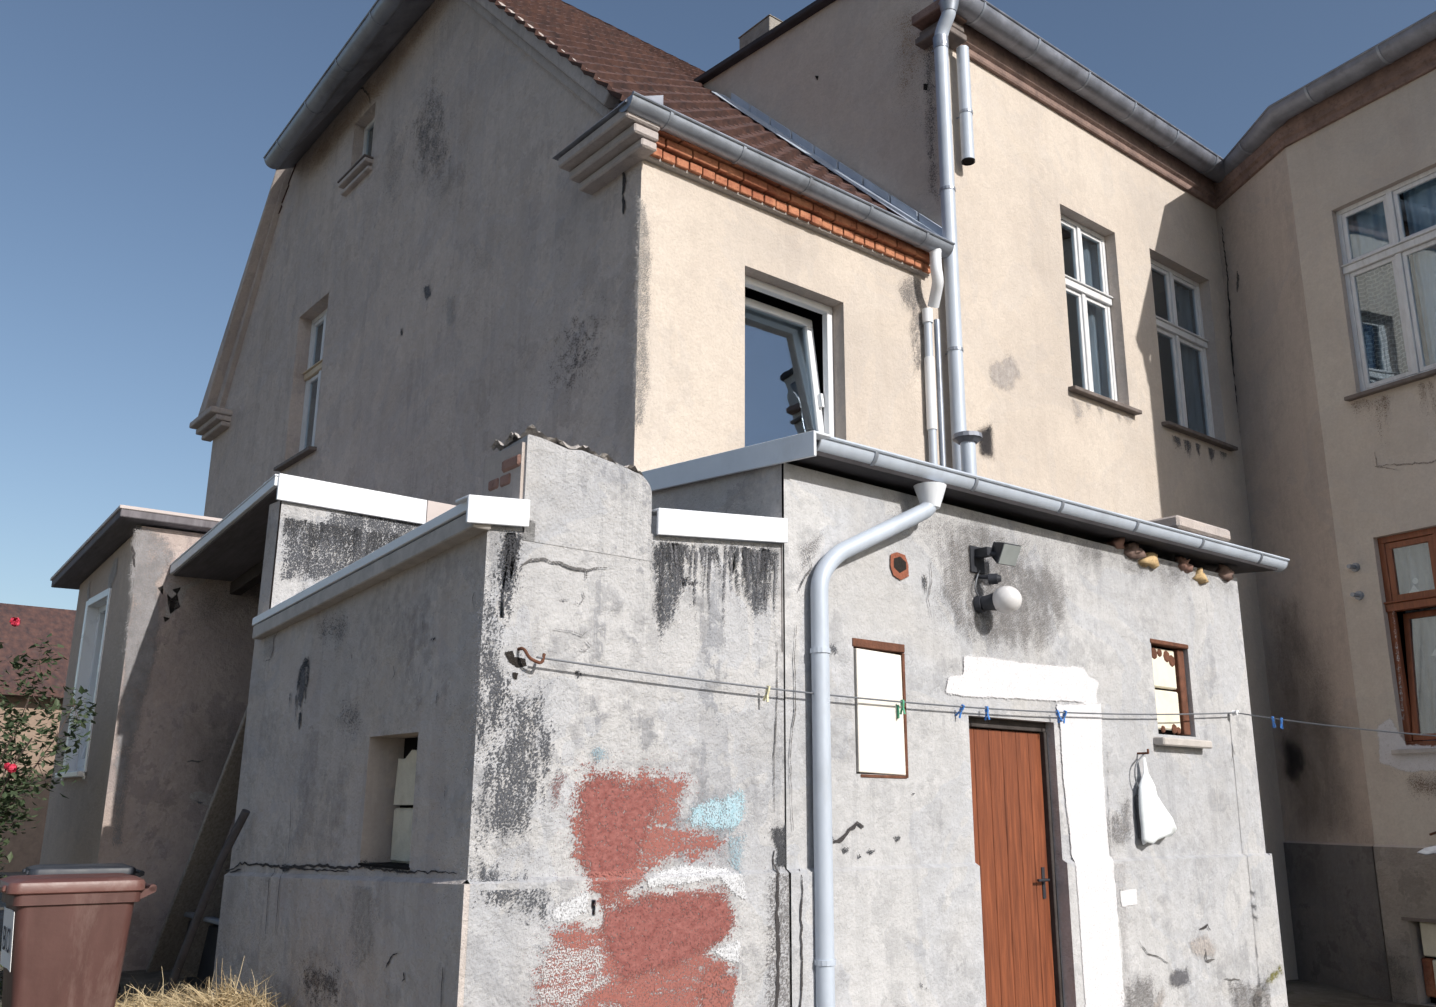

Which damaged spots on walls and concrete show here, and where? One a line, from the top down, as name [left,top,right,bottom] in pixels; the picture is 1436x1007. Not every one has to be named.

crack [1375,456,1435,470]
water stain [280,510,422,587]
water stain [650,539,780,656]
peeling [110,525,206,849]
water stain [289,657,310,729]
water stain [456,530,567,930]